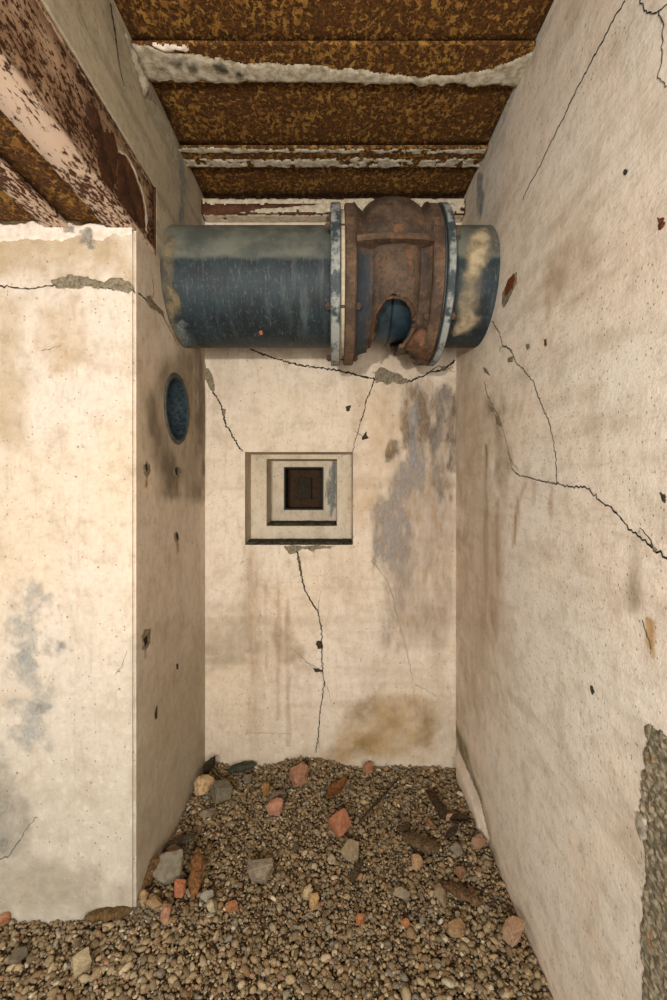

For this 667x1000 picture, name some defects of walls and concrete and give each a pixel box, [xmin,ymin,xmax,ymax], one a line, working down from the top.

rust [97,131,145,229]
crack [522,0,667,200]
crack [0,282,66,290]
crack [205,365,243,451]
crack [250,348,375,457]
water stain [373,385,456,595]
crack [407,359,455,383]
crack [484,322,667,559]
crack [291,551,330,750]
spalling [636,724,667,1000]